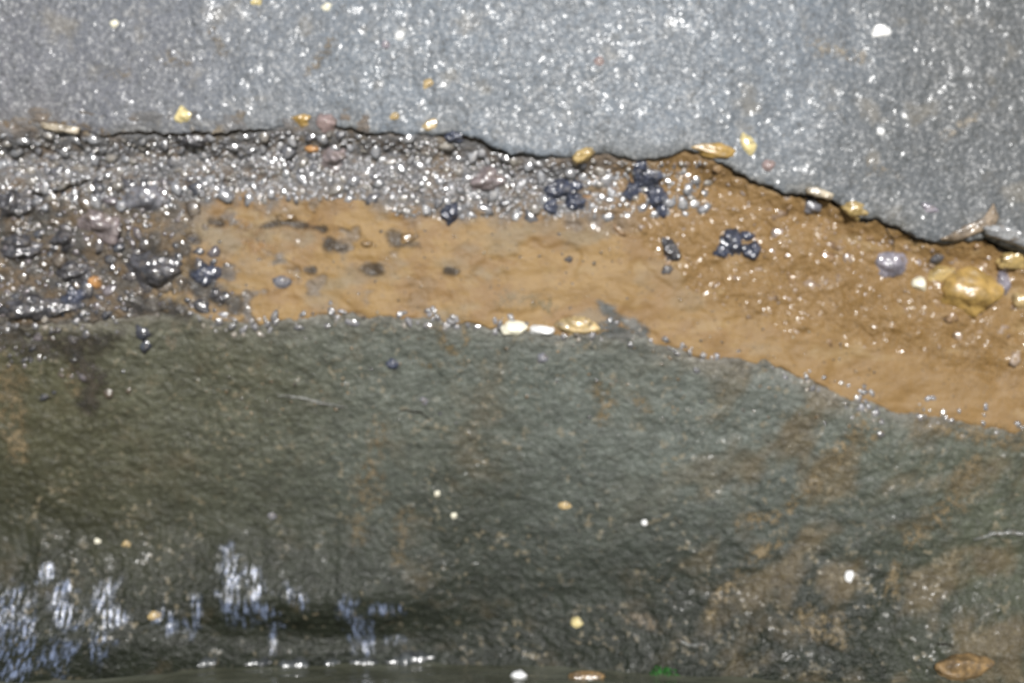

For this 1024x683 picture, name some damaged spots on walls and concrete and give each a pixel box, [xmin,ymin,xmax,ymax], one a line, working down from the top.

crack [99,129,269,138]
crack [335,126,407,137]
crack [435,132,536,168]
crack [697,162,936,251]
spalling [0,107,1024,440]
leakage [0,588,77,682]
leakage [38,563,77,629]
leakage [91,583,128,658]
leakage [155,595,200,635]
leakage [197,657,218,668]
leakage [215,543,309,668]
leakage [324,600,435,666]